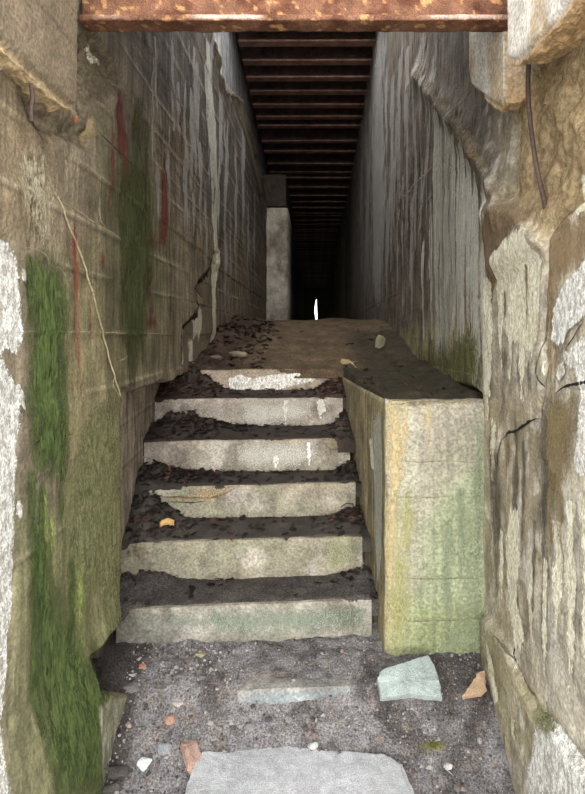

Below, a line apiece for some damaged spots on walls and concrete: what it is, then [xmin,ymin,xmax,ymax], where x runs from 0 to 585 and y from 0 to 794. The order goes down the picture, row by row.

leakage [22,153,57,238]
crack [26,176,210,396]
leakage [99,92,167,351]
leakage [181,302,202,373]
leakage [204,33,222,342]
leakage [421,104,585,694]
crack [487,400,543,466]
crack [533,304,585,393]